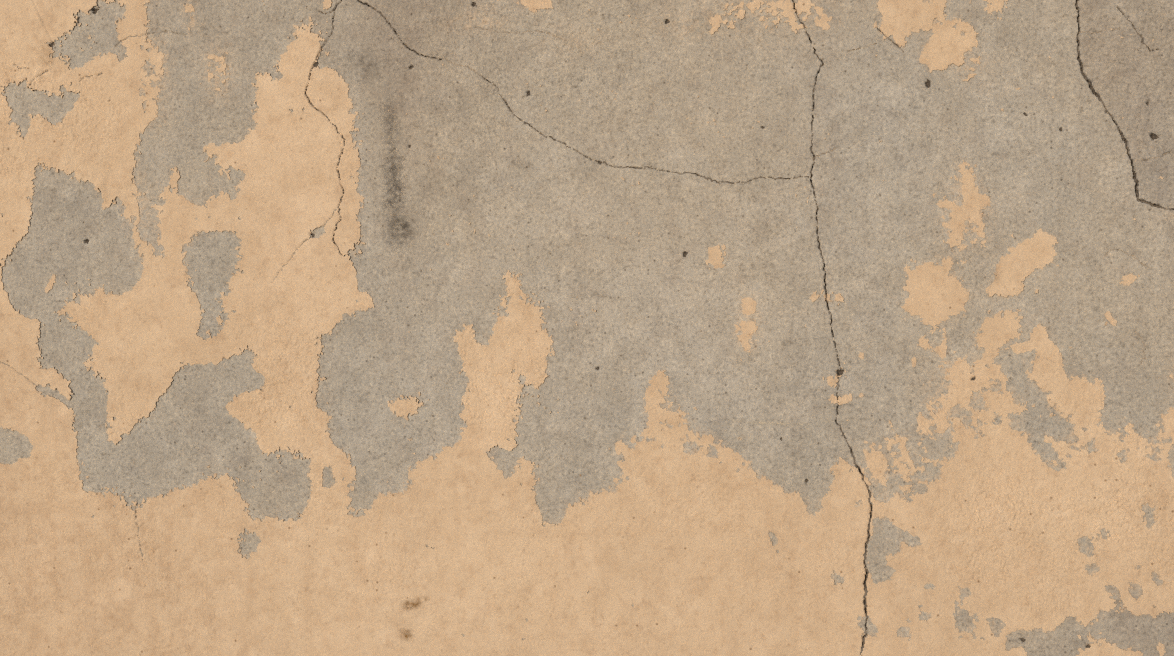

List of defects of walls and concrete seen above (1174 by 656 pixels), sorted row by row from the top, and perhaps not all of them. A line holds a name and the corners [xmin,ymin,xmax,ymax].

peeling [1,0,128,138]
crack [1075,0,1174,210]
peeling [0,163,313,522]
crack [276,0,904,656]
peeling [132,0,1174,528]
peeling [953,565,1174,656]
peeling [1077,528,1111,576]